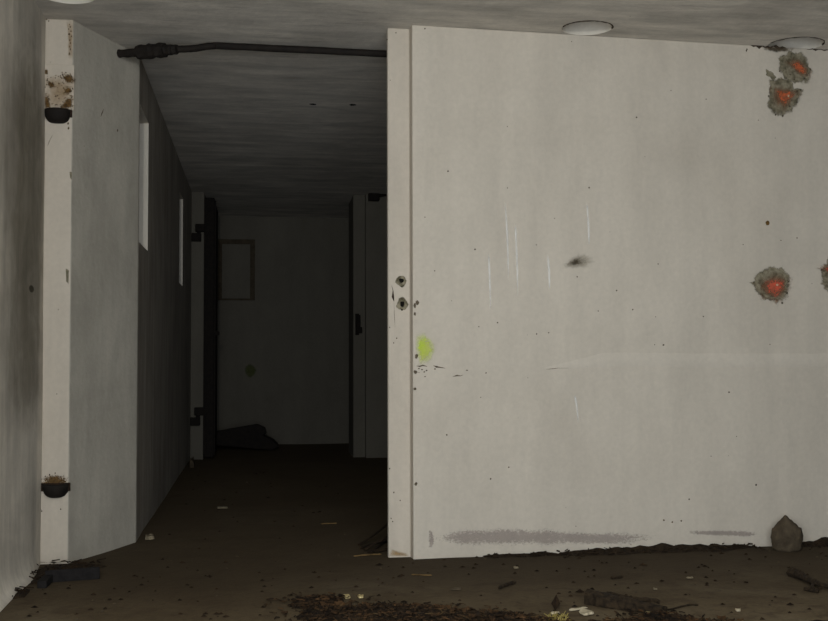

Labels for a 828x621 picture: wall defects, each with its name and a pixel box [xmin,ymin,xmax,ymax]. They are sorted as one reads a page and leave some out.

spalling [766,51,812,117]
spalling [751,267,789,304]